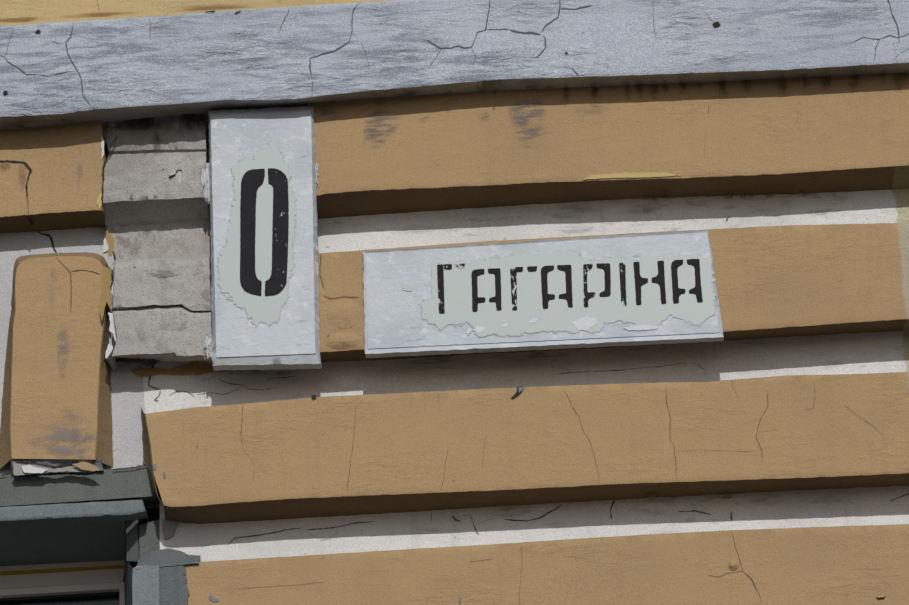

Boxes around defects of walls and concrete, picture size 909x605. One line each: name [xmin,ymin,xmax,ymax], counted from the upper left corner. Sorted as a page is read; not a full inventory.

crack [0,26,92,106]
crack [309,4,369,86]
crack [424,0,591,66]
crack [850,0,909,59]
crack [101,135,117,207]
crack [0,160,114,311]
crack [101,319,297,428]
crack [559,363,698,461]
crack [679,510,761,598]